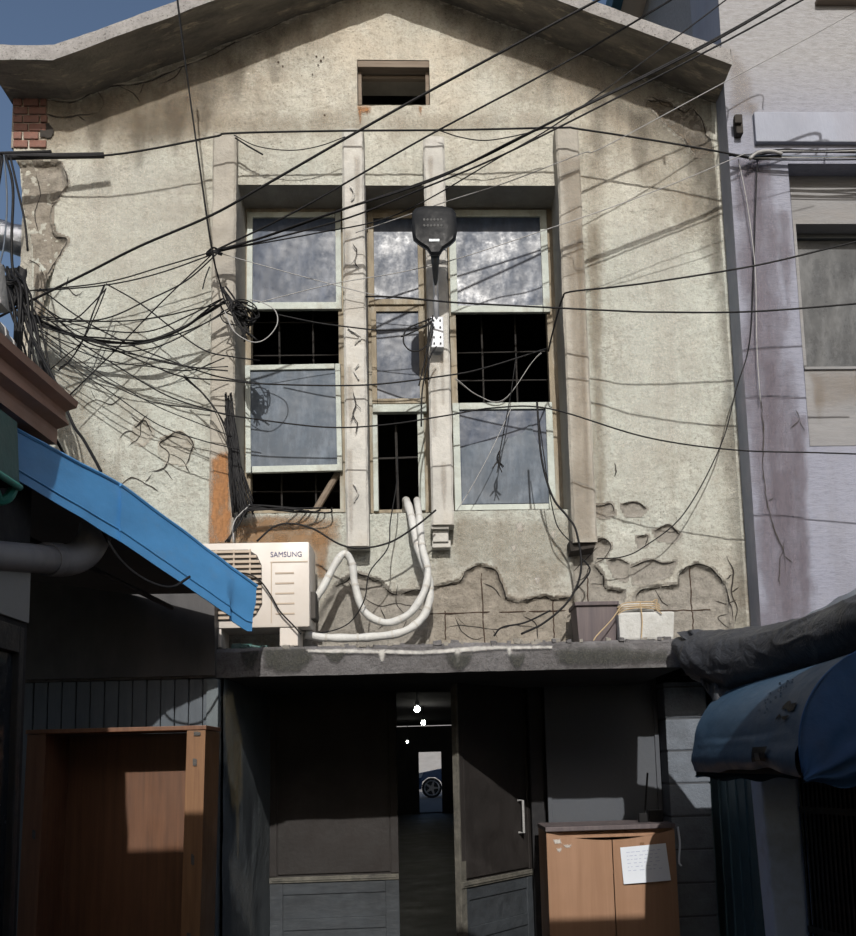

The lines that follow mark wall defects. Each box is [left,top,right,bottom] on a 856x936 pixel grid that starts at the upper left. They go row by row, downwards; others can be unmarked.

flaking render [11,98,70,315]
peeling [130,418,195,466]
corrosion [210,453,335,576]
peeling [596,501,649,519]
flaking render [281,524,736,649]